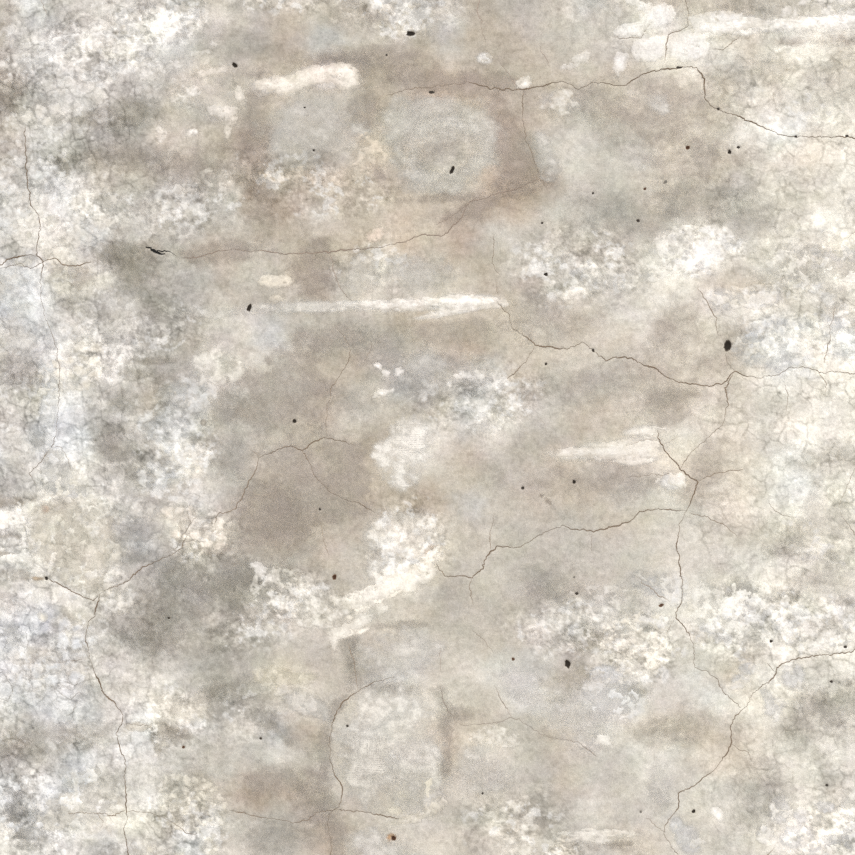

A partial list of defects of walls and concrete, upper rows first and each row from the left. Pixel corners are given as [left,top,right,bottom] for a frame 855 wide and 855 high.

peeling [29,0,238,109]
peeling [207,85,245,140]
spalling [253,61,361,95]
damp [384,72,558,219]
damp [477,53,493,64]
crack [138,0,855,297]
peeling [612,0,855,77]
crack [0,131,90,477]
spalling [345,294,509,318]
crack [50,332,398,855]
peeling [249,513,441,650]
crack [437,237,855,853]